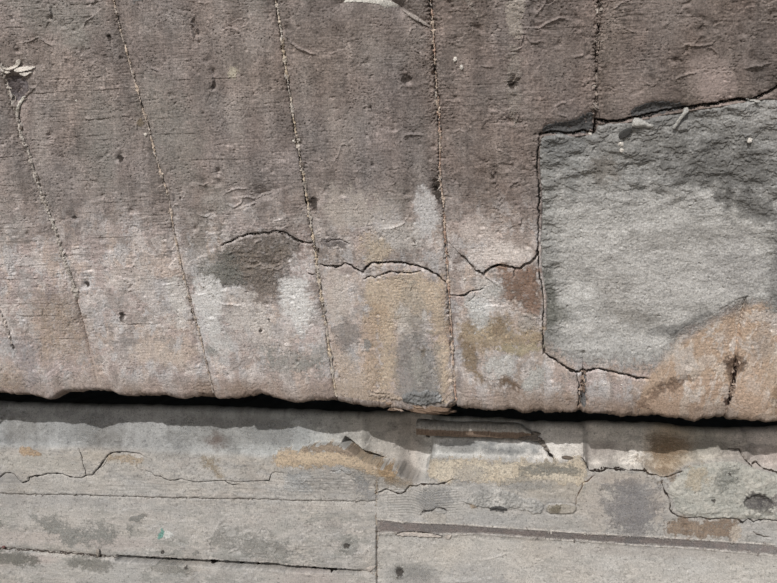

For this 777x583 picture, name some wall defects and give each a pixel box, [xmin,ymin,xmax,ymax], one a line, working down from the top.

peeling [344,0,430,27]
peeling [1,60,35,76]
spalling [542,112,594,134]
spalling [631,101,689,129]
crack [223,230,349,245]
crack [308,85,777,406]
crack [0,450,142,483]
crack [153,472,280,485]
spalling [275,442,398,483]
crack [728,448,777,473]
crack [575,457,777,537]